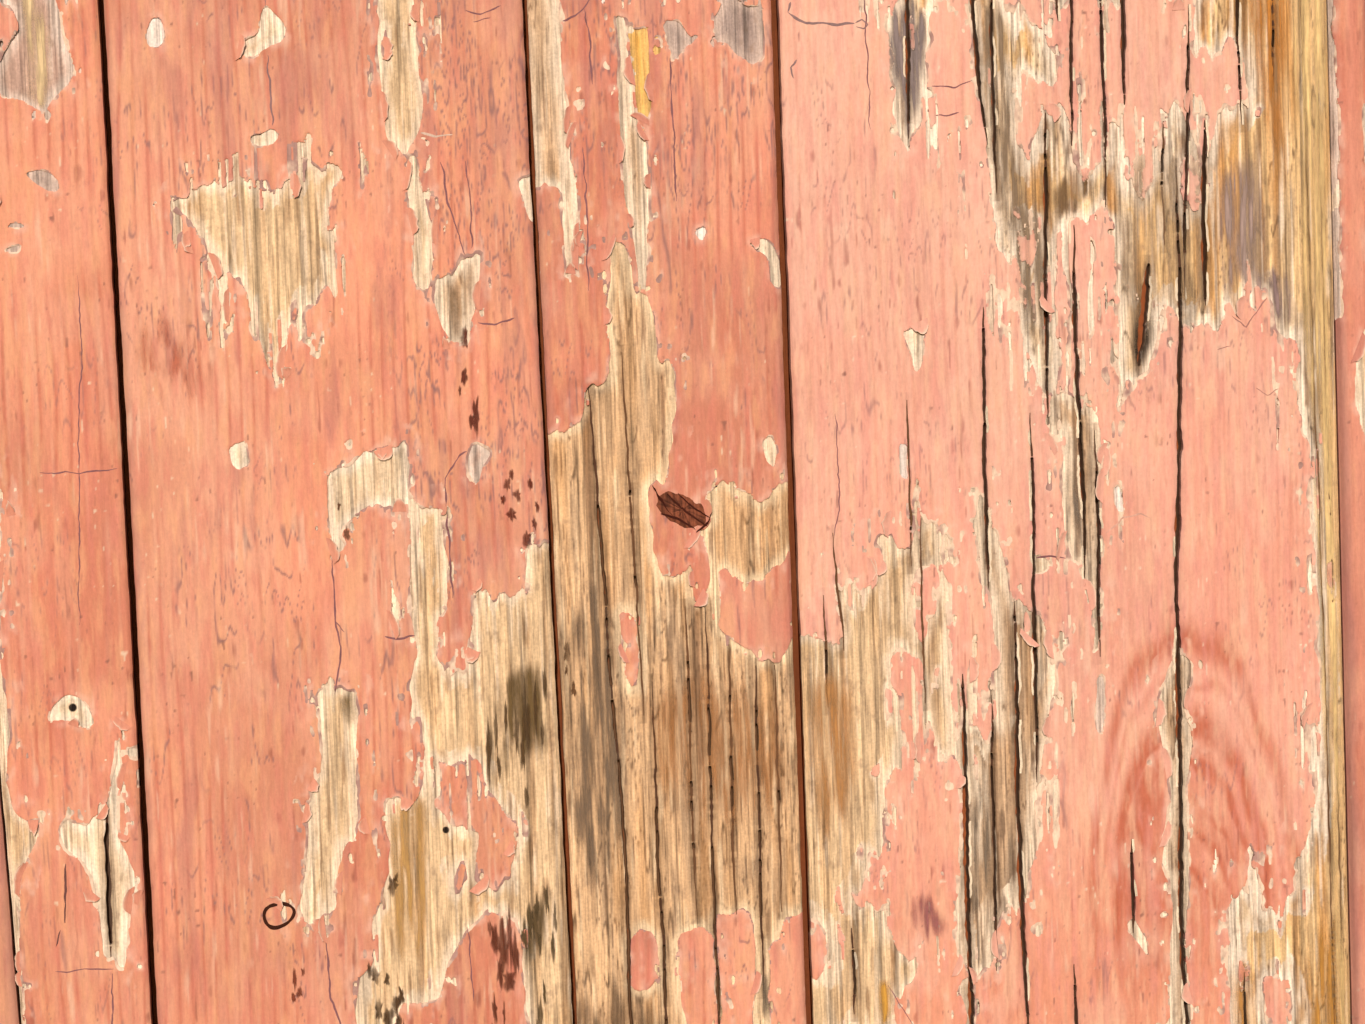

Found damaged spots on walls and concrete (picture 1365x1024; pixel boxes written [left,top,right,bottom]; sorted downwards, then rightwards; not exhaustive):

peeling [0,0,81,123]
peeling [27,169,59,192]
peeling [145,17,165,48]
peeling [152,129,346,388]
peeling [235,5,286,61]
crack [1235,0,1303,125]
peeling [1351,329,1365,435]
peeling [266,0,1351,1024]
crack [906,400,926,703]
crack [961,0,1267,1024]
crack [1304,105,1344,1024]
peeling [0,488,143,1024]